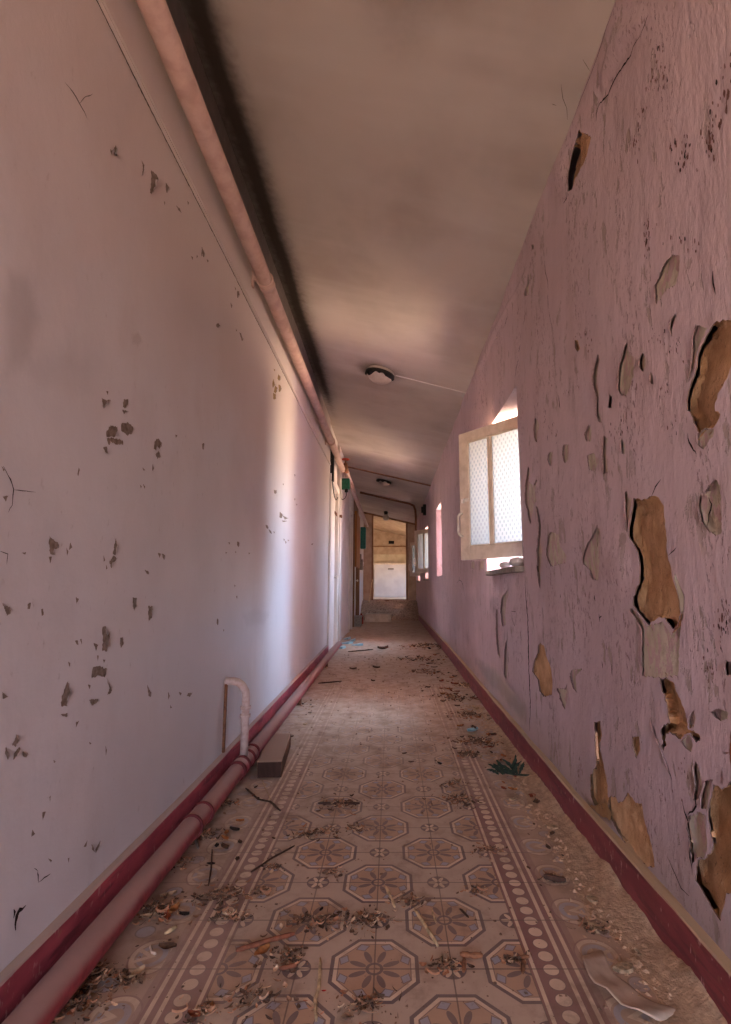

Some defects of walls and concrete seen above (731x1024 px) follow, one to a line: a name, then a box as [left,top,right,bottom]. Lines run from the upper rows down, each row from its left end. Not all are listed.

crack [553,8,648,120]
spalling [573,131,591,184]
peeling [654,231,699,302]
spalling [102,391,134,453]
spalling [690,320,731,449]
spalling [49,537,72,563]
spalling [624,492,682,633]
spalling [61,682,79,726]
spalling [75,626,124,705]
spalling [534,644,582,707]
spalling [593,721,655,868]
spalling [663,674,731,920]